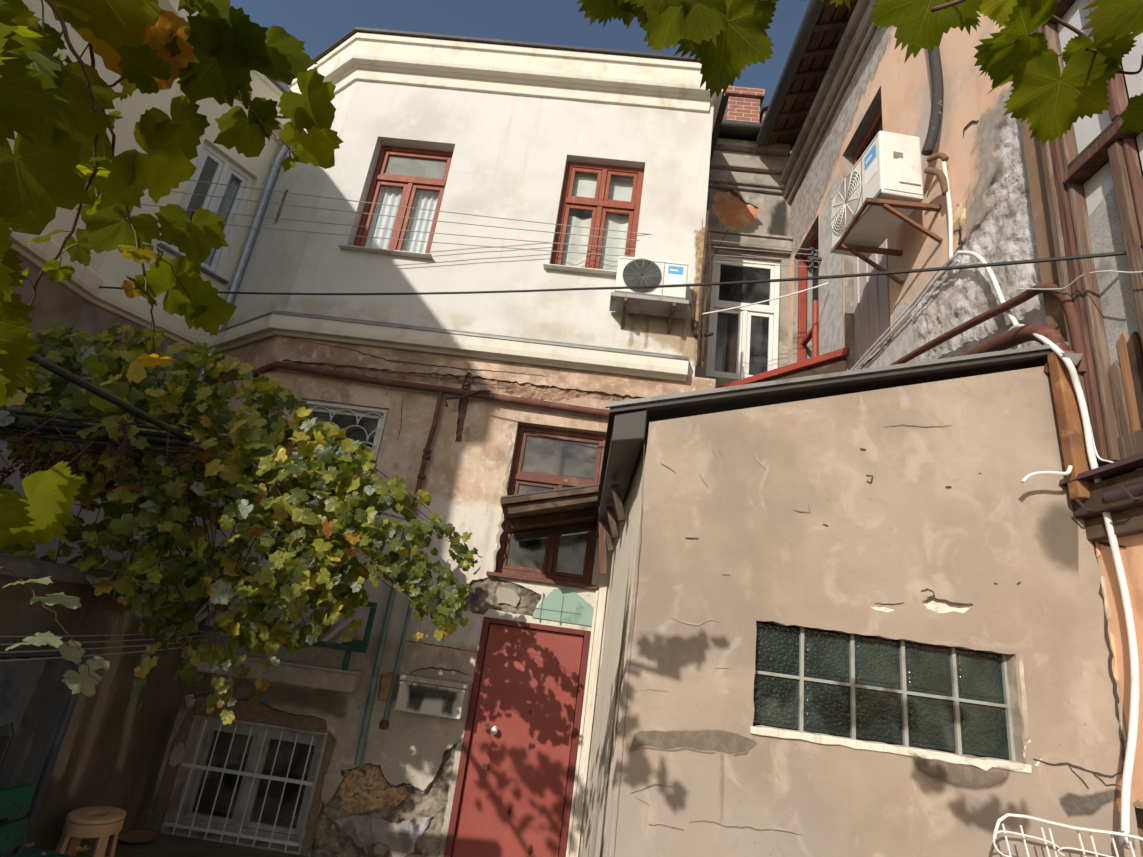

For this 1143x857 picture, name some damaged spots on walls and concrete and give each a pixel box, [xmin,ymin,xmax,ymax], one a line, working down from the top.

flaking render [692,188,758,365]
spalling [502,434,514,496]
spalling [466,511,542,617]
spalling [921,588,973,613]
crack [1033,541,1143,813]
spalling [149,692,463,857]